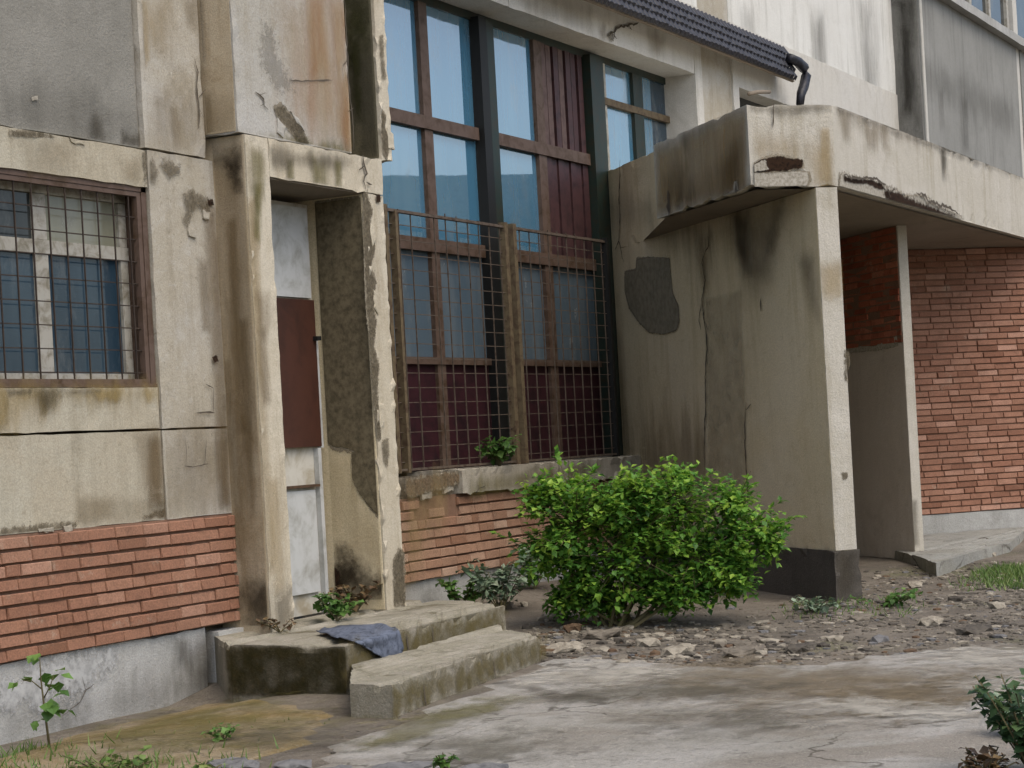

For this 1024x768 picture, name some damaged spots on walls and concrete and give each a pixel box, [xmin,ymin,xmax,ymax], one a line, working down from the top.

crack [609,23,638,39]
crack [291,0,372,188]
spalling [274,102,309,144]
spalling [754,153,811,187]
spalling [183,189,214,238]
spalling [839,171,963,220]
peeling [315,192,389,518]
crack [699,240,709,460]
water stain [334,550,382,600]
spalling [392,548,406,607]